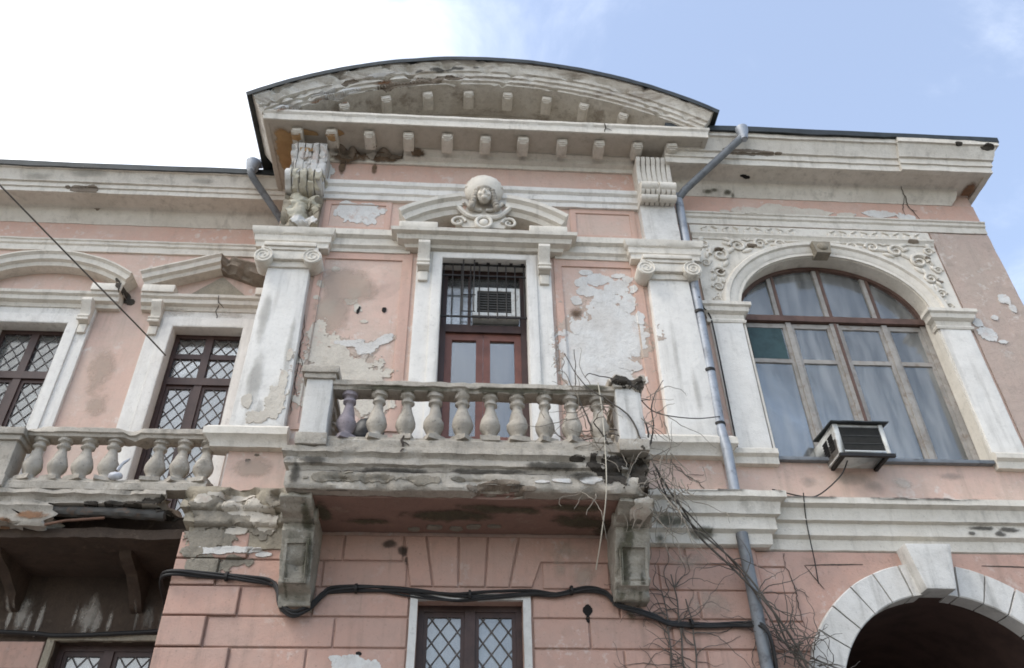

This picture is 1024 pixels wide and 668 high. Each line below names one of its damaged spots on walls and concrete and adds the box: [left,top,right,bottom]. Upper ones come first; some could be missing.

spalling [285,143,404,227]
peeling [241,280,398,424]
peeling [549,270,667,393]
peeling [972,311,1008,344]
peeling [997,294,1017,313]
spalling [44,491,280,579]
damp [415,505,538,522]
spalling [303,445,654,529]
damp [550,505,610,534]